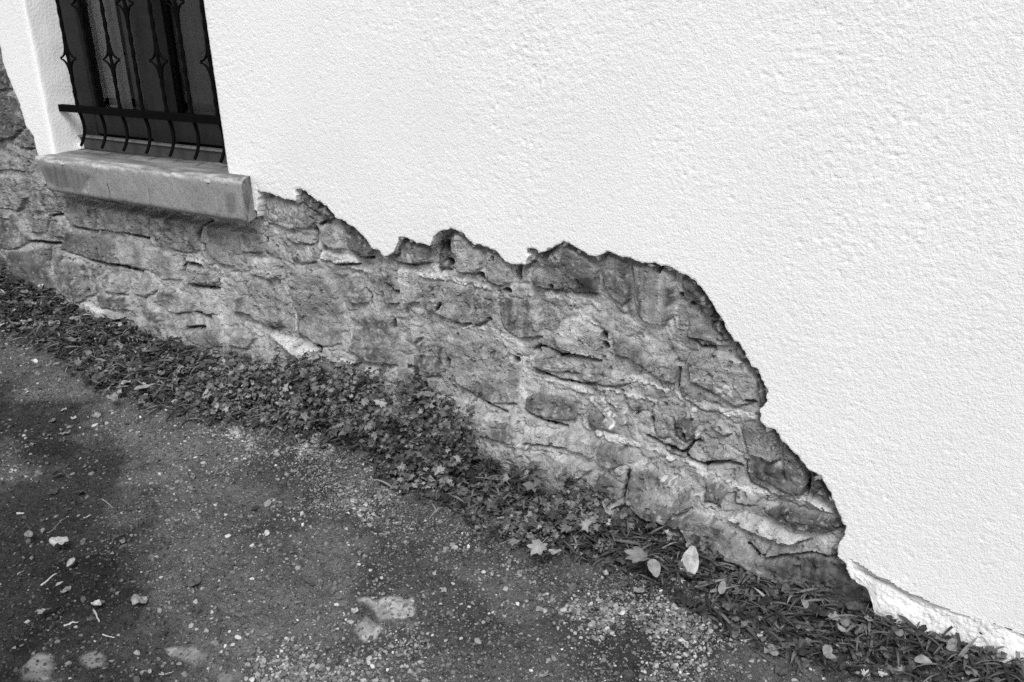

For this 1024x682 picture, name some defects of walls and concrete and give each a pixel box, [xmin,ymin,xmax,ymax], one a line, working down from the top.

spalling [0,47,872,602]